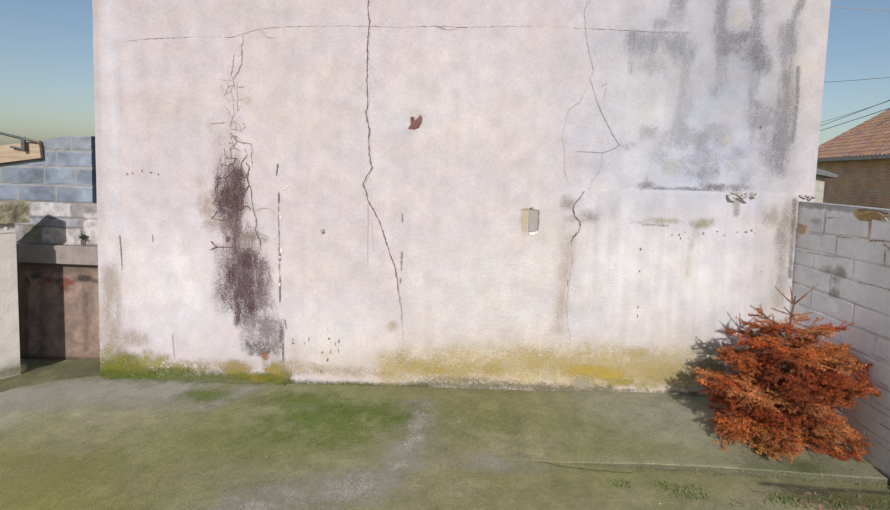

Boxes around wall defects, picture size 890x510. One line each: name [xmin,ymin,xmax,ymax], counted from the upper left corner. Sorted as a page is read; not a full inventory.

crack [128,27,288,361]
water stain [201,156,284,356]
crack [293,0,689,349]
water stain [670,115,748,216]
water stain [716,0,770,69]
water stain [751,0,803,172]
water stain [381,348,715,384]